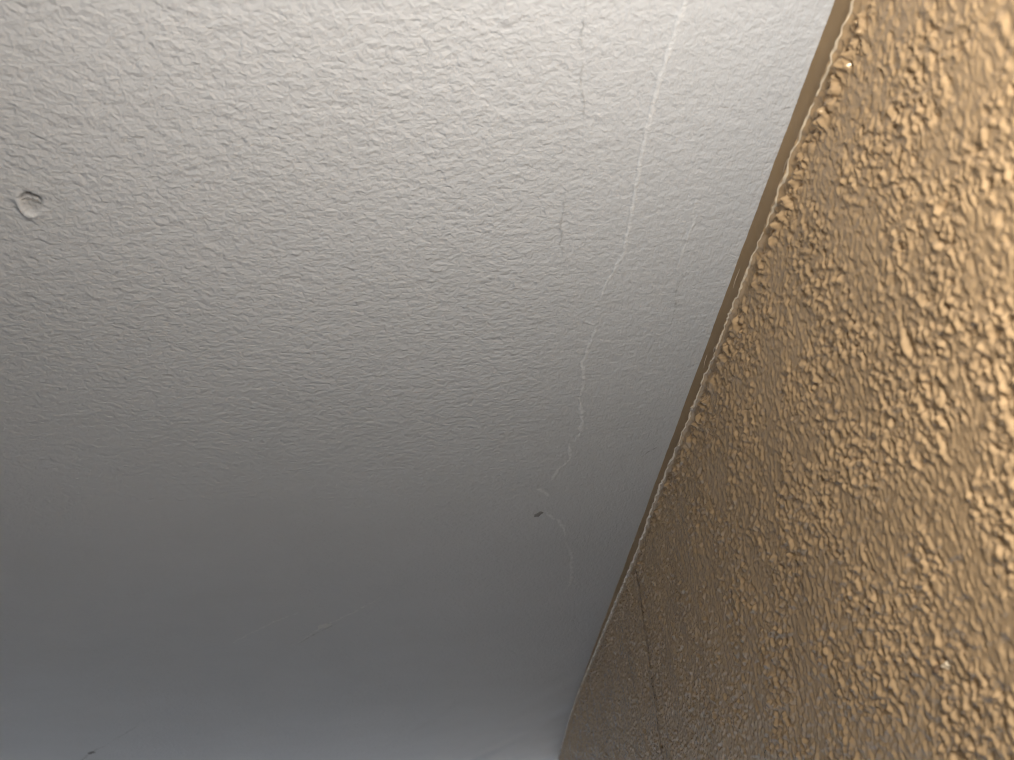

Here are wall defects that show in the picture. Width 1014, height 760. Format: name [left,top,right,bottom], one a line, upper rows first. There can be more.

crack [536,0,689,595]